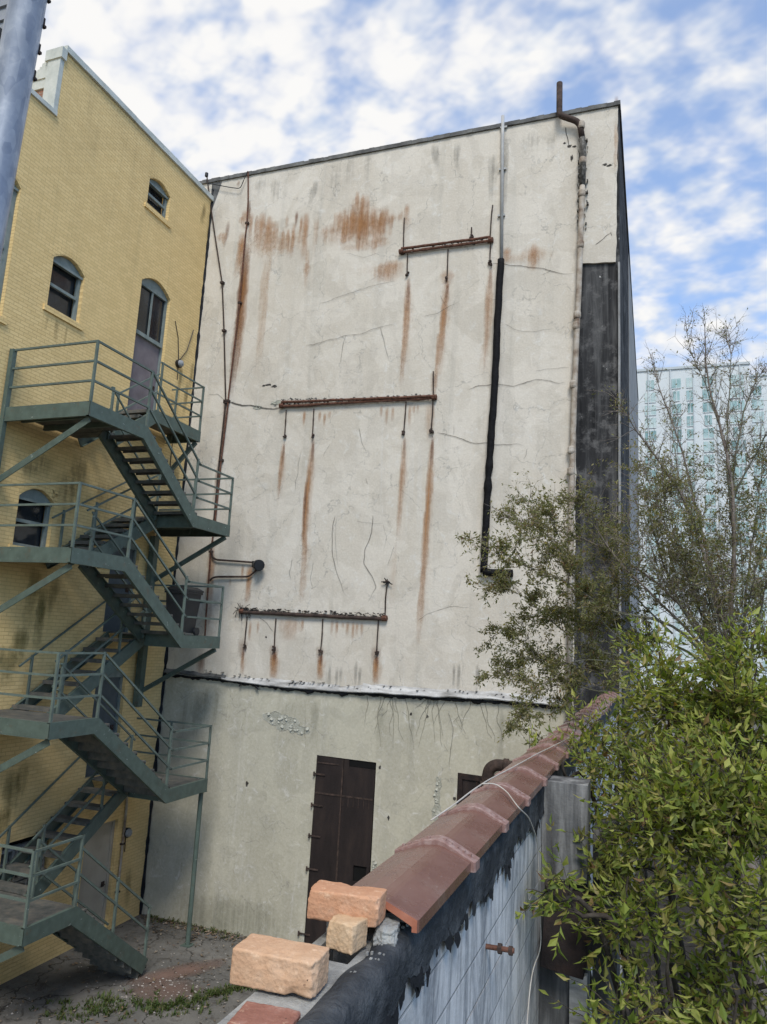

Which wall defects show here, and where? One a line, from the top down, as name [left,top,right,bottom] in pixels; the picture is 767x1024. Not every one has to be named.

corrosion [236,240,246,340]